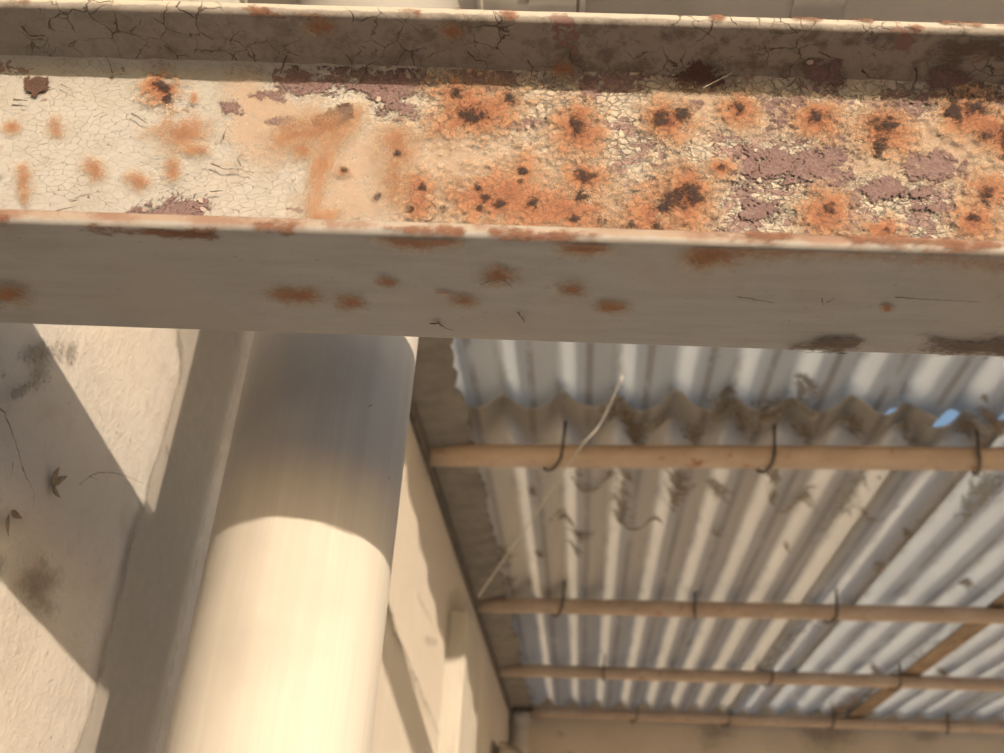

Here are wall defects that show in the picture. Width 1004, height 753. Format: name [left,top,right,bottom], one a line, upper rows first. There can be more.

rust [23,75,51,97]
rust [3,121,20,133]
rust [134,64,209,181]
peeling [726,58,969,225]
rust [84,157,104,180]
rust [223,59,1004,272]
rust [15,163,33,204]
rust [125,171,150,192]
rust [81,223,217,240]
rust [267,287,322,303]
leakage [11,339,78,400]